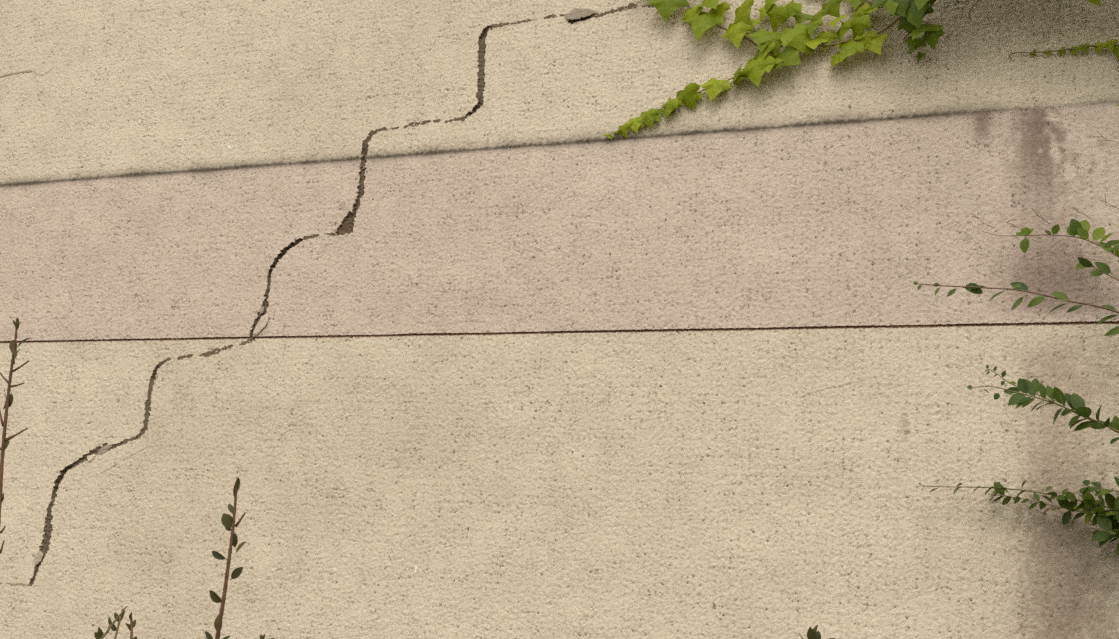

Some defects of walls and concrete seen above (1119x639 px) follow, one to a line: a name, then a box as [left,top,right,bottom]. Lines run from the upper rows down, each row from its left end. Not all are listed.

crack [0,3,655,586]